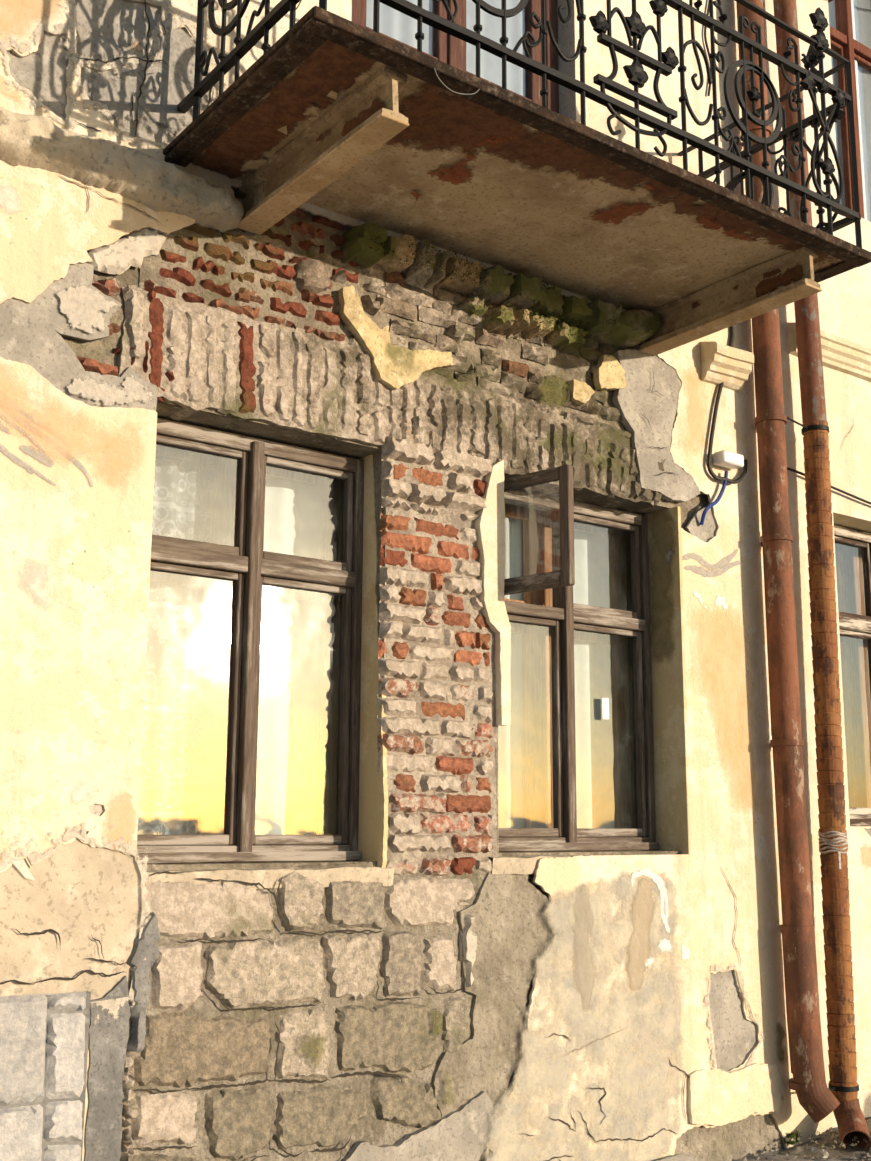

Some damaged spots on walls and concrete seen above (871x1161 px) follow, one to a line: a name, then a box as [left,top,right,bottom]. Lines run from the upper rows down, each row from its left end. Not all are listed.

flaking render [0,0,225,152]
crack [77,0,177,137]
flaking render [685,507,717,542]
flaking render [0,208,662,1161]
crack [0,929,127,985]
crack [544,1029,624,1056]
crack [526,1056,689,1161]
peeling [674,964,784,1161]